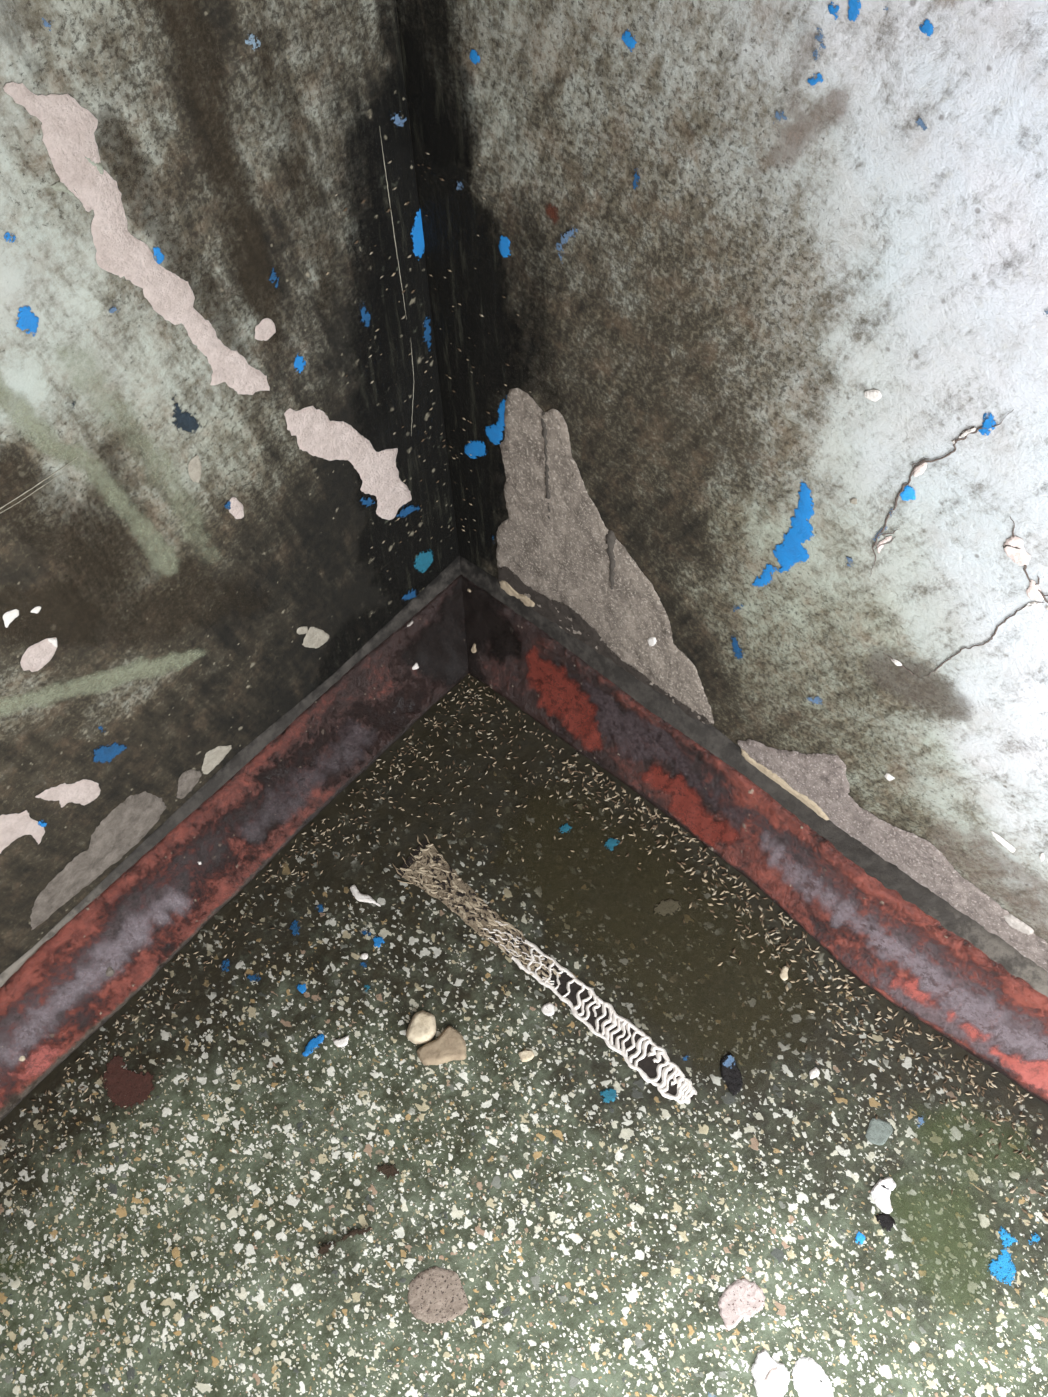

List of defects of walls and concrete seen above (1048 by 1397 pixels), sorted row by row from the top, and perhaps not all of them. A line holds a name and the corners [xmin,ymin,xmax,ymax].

flaking render [3,82,270,395]
water stain [103,125,237,348]
water stain [155,0,278,341]
water stain [320,0,544,685]
flaking render [284,406,420,520]
flaking render [496,388,714,725]
water stain [871,657,965,718]
crack [870,409,1014,576]
crack [884,517,1048,678]
peeling [0,779,100,853]
peeling [737,739,1048,972]
corrosion [102,1054,155,1109]